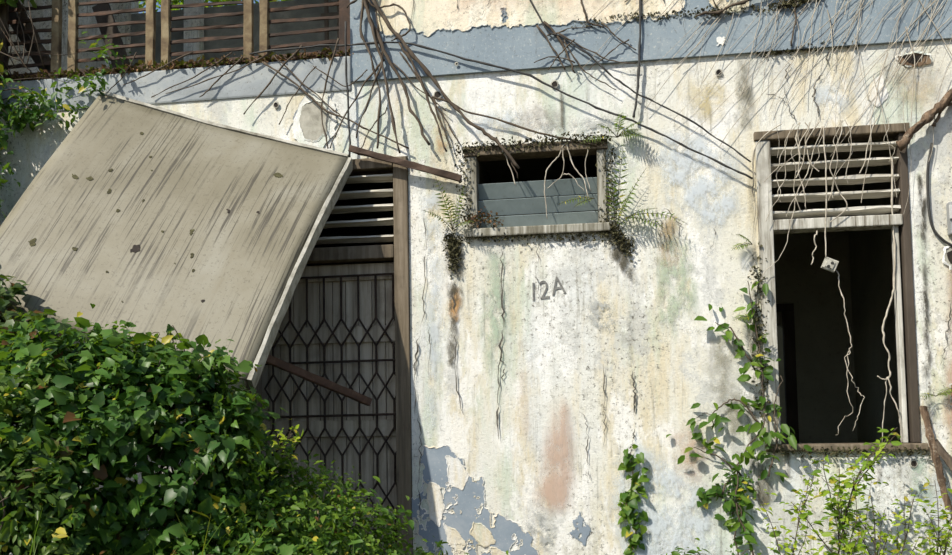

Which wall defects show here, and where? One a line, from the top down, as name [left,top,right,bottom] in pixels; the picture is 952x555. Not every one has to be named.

peeling [373,0,686,37]
peeling [707,0,750,15]
spalling [895,51,933,67]
crack [767,48,830,122]
water stain [611,235,632,279]
rust [450,293,460,321]
crack [413,207,431,518]
crack [451,288,464,415]
crack [496,244,505,439]
peeling [412,445,553,555]
peeling [569,511,591,546]